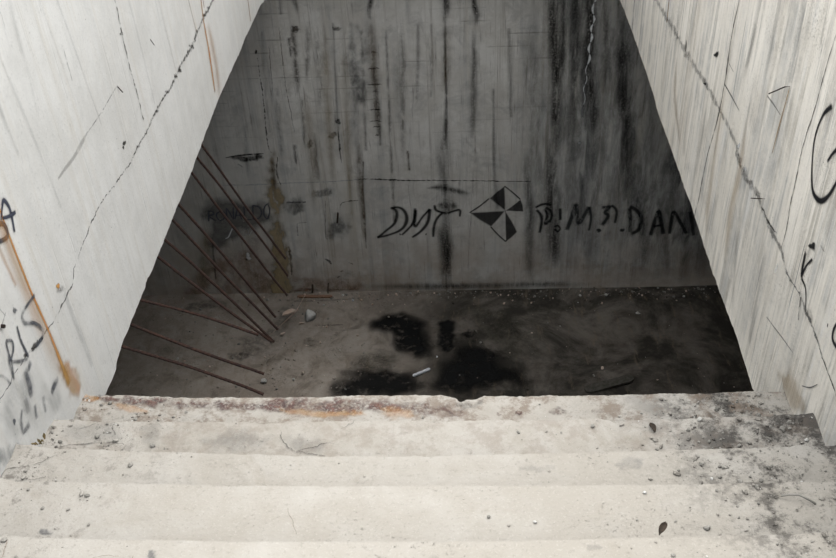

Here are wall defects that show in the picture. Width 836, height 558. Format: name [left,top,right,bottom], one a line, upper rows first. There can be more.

rust [9,235,69,384]
crack [0,0,213,399]
damp [255,161,311,293]
crack [691,3,836,395]